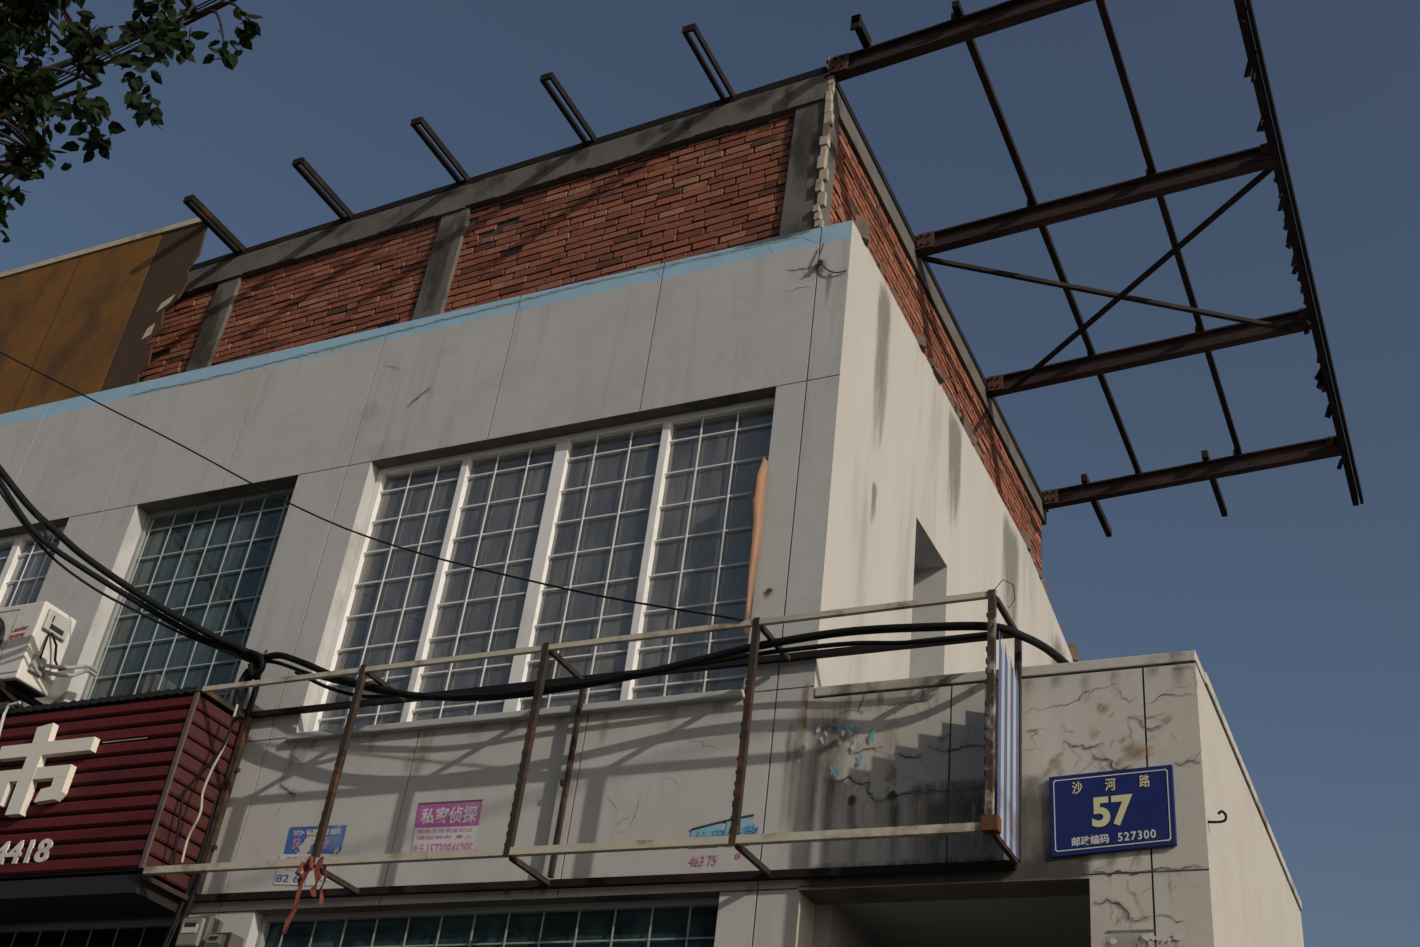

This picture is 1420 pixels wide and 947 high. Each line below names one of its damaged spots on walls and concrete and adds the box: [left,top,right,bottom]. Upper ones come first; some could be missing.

crack [129,237,821,413]
crack [822,643,1201,808]
leakage [807,778,1089,888]
crack [1094,850,1204,934]